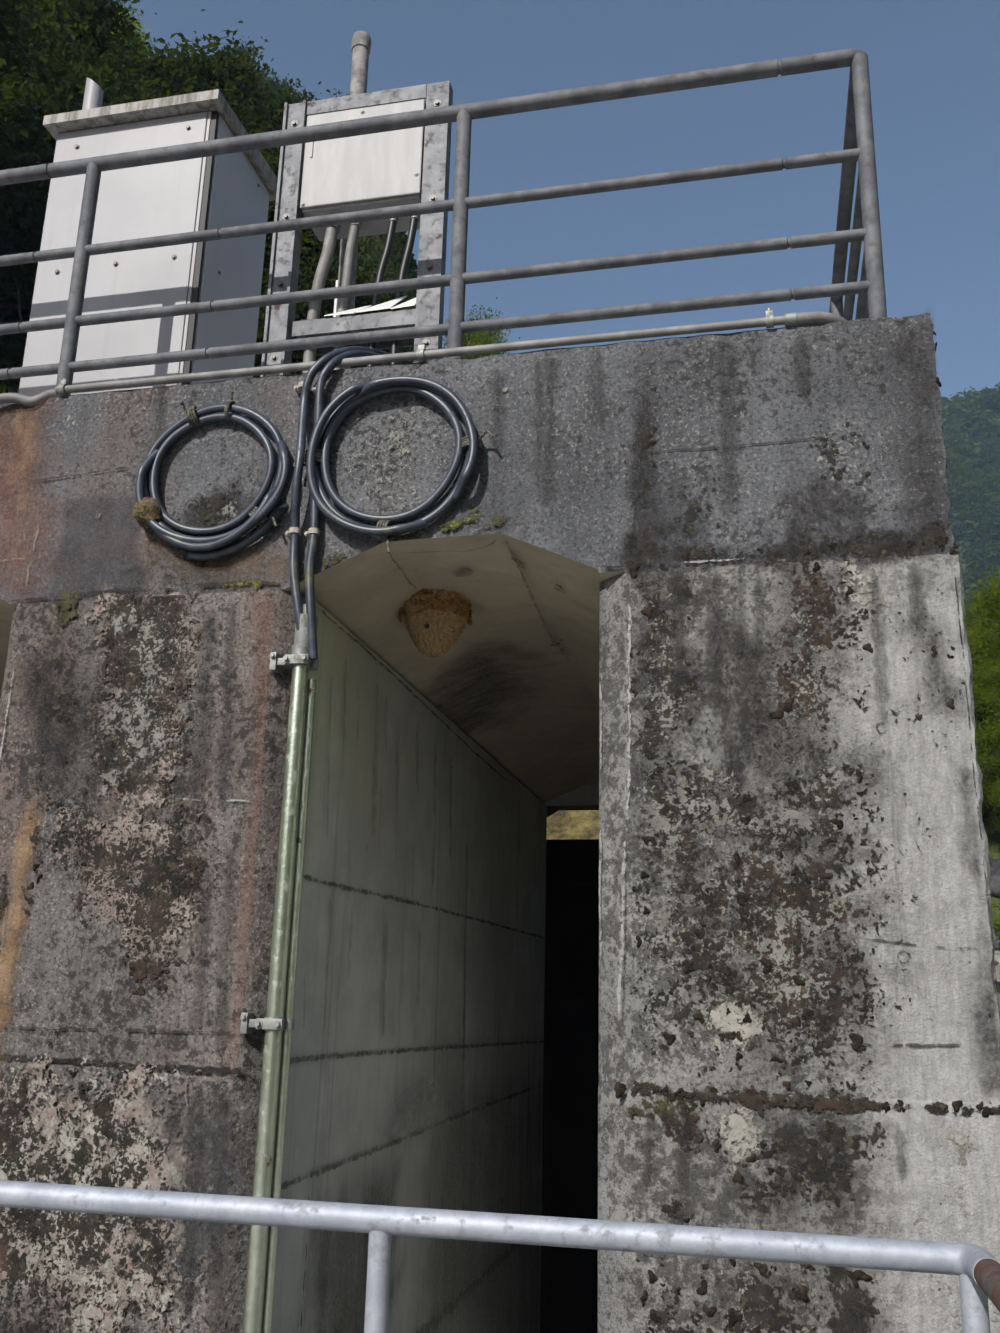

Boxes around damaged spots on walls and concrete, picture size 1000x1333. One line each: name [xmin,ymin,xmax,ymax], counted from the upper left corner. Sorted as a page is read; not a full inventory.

damp [621,346,733,563]
crack [654,436,822,452]
damp [712,546,877,781]
rust [0,808,35,1021]
peeling [614,921,853,1200]
damp [941,1122,979,1167]
peeling [938,1100,995,1118]
damp [977,991,1000,1088]